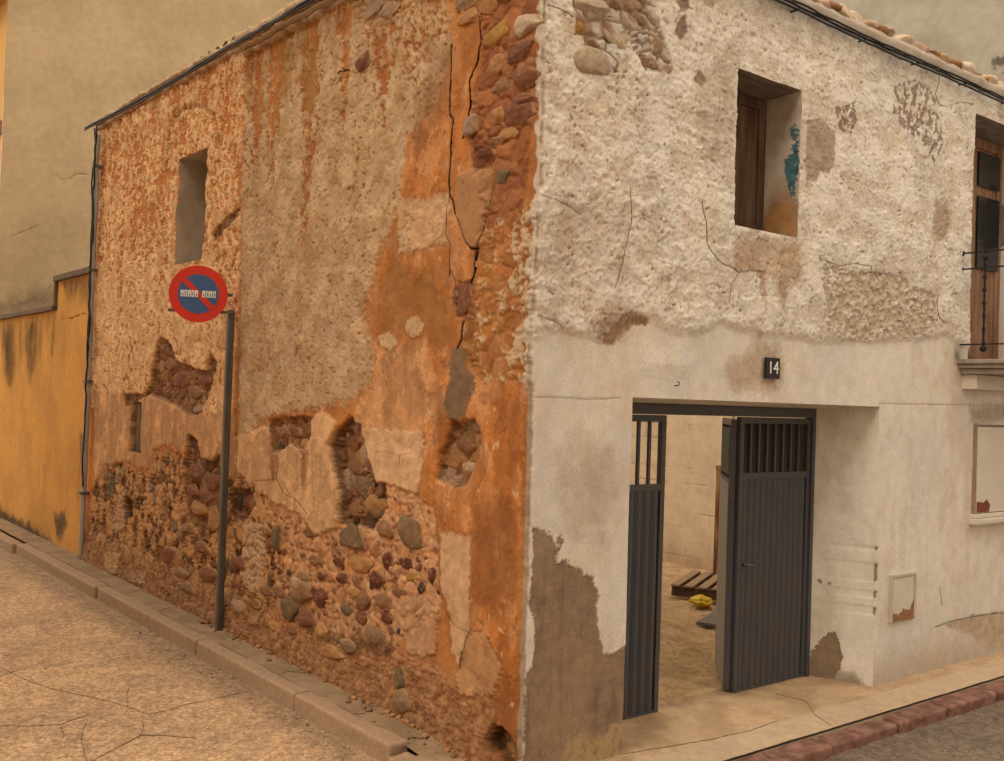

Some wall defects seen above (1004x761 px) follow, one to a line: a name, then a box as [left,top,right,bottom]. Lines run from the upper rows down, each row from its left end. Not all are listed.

flaking render [572,0,672,76]
peeling [675,0,690,40]
crack [445,11,496,349]
flaking render [405,0,544,253]
peeling [784,102,857,201]
peeling [890,79,943,165]
crack [702,204,762,300]
spalling [602,310,648,345]
spalling [125,337,218,416]
spalling [159,435,221,596]
flaking render [222,416,625,761]
peeling [809,631,844,679]